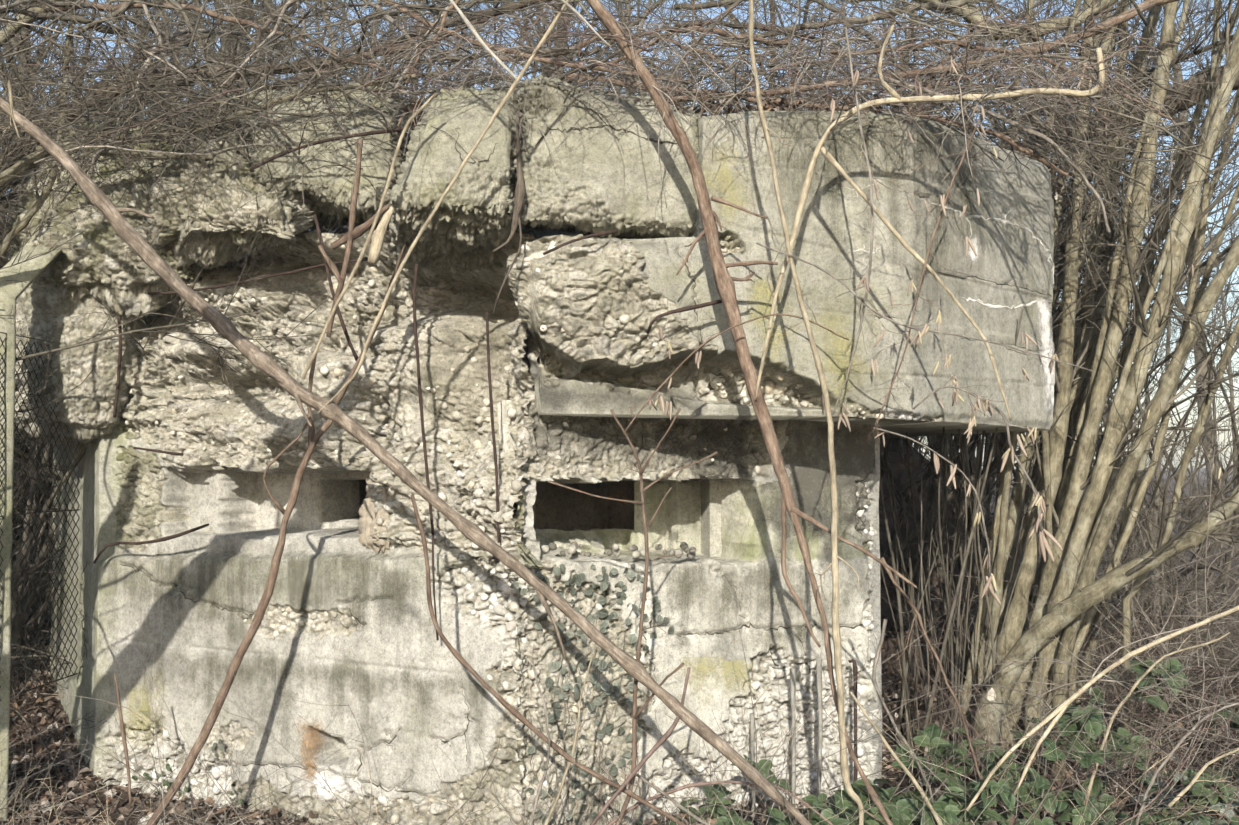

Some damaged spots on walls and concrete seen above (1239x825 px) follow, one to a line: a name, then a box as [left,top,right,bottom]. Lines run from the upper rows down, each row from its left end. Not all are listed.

crack [536,92,677,145]
spalling [96,229,941,825]
crack [121,564,252,616]
crack [77,563,91,683]
corrosion [302,724,321,778]